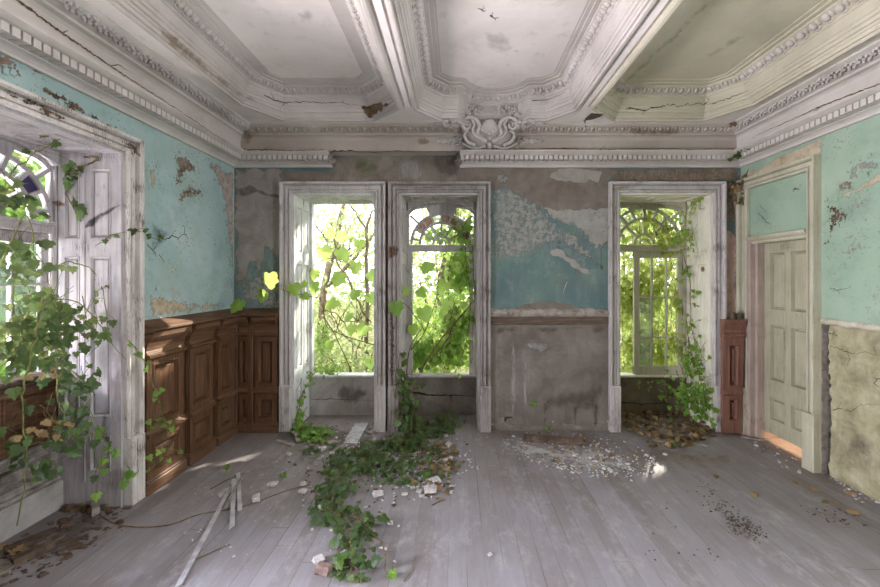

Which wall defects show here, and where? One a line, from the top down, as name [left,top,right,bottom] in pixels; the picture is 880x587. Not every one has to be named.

peeling [0,55,42,77]
crack [17,0,223,140]
peeling [1,87,155,189]
crack [264,92,360,109]
spalling [361,102,389,119]
crack [628,91,745,115]
peeling [174,150,206,207]
spalling [204,136,825,318]
peeling [820,153,880,244]
crack [147,228,188,301]
crack [411,391,468,401]